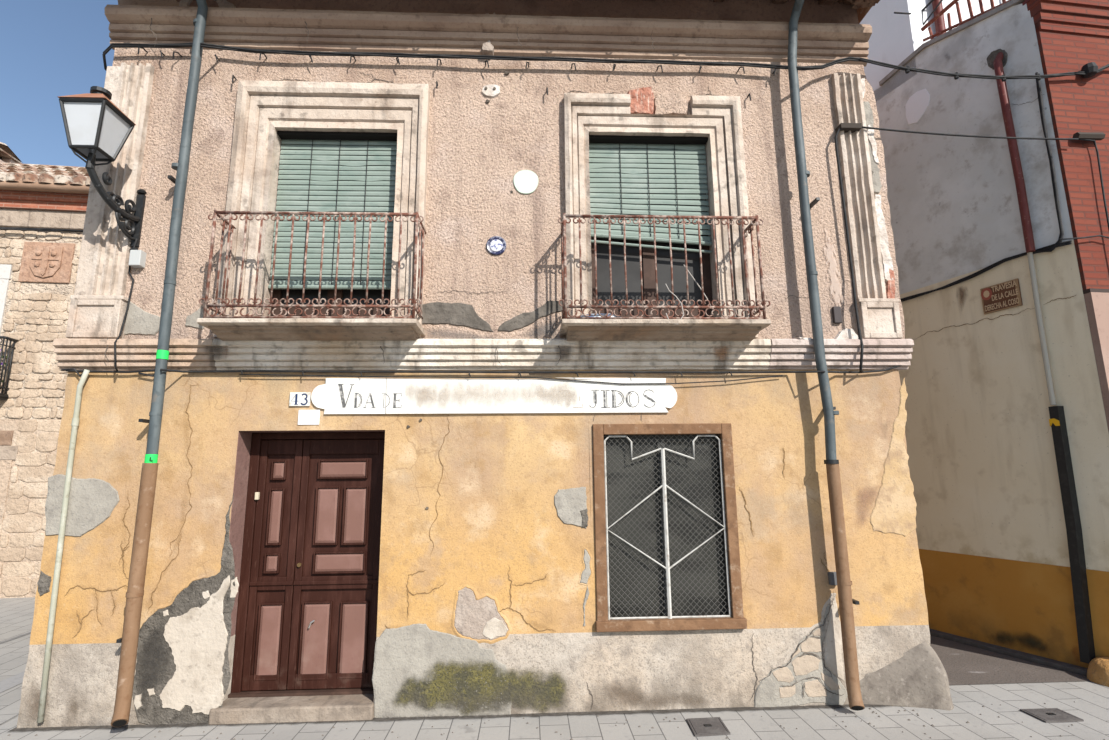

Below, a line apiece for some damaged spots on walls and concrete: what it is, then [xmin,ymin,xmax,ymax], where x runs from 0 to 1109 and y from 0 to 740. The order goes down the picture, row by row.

spalling [628,86,688,115]
crack [66,386,193,637]
crack [385,416,450,629]
spalling [580,509,588,528]
spalling [870,378,917,537]
peeling [132,493,239,725]
spalling [451,584,512,644]